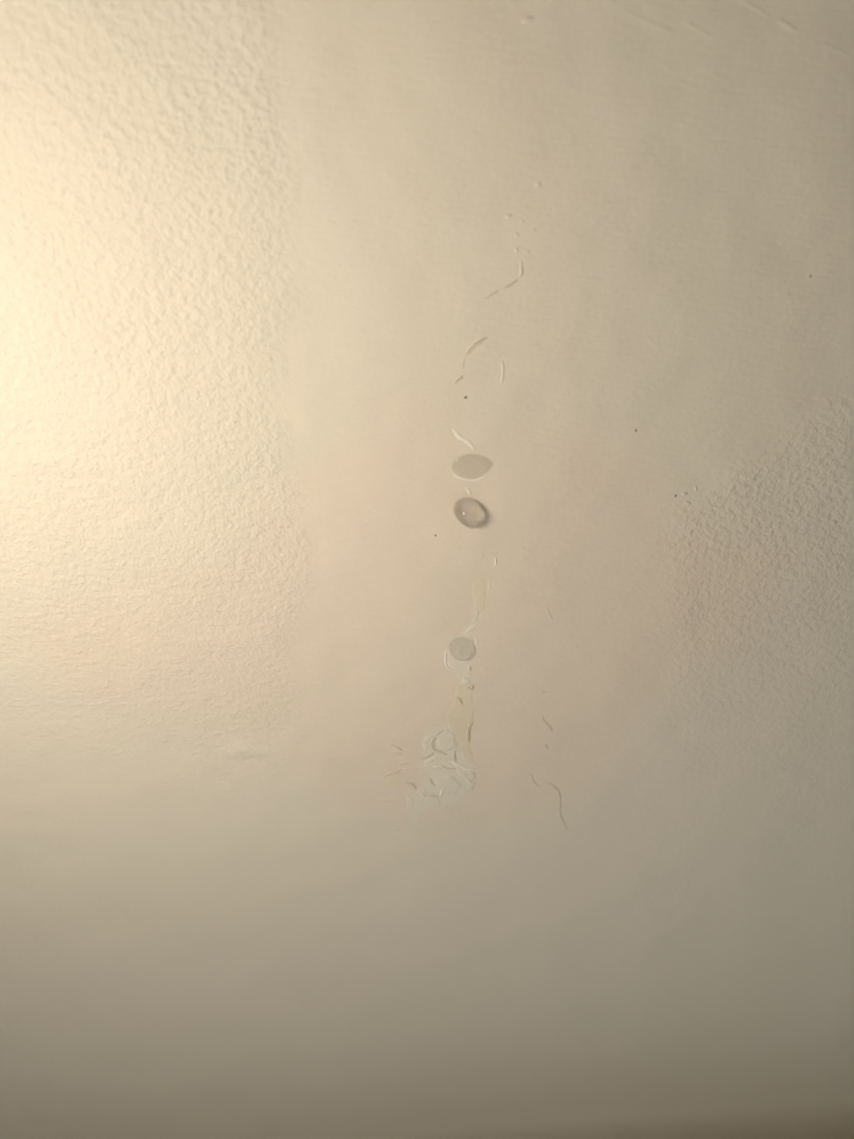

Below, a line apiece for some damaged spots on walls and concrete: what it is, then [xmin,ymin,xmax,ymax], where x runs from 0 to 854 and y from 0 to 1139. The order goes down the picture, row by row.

crack [452,337,505,416]